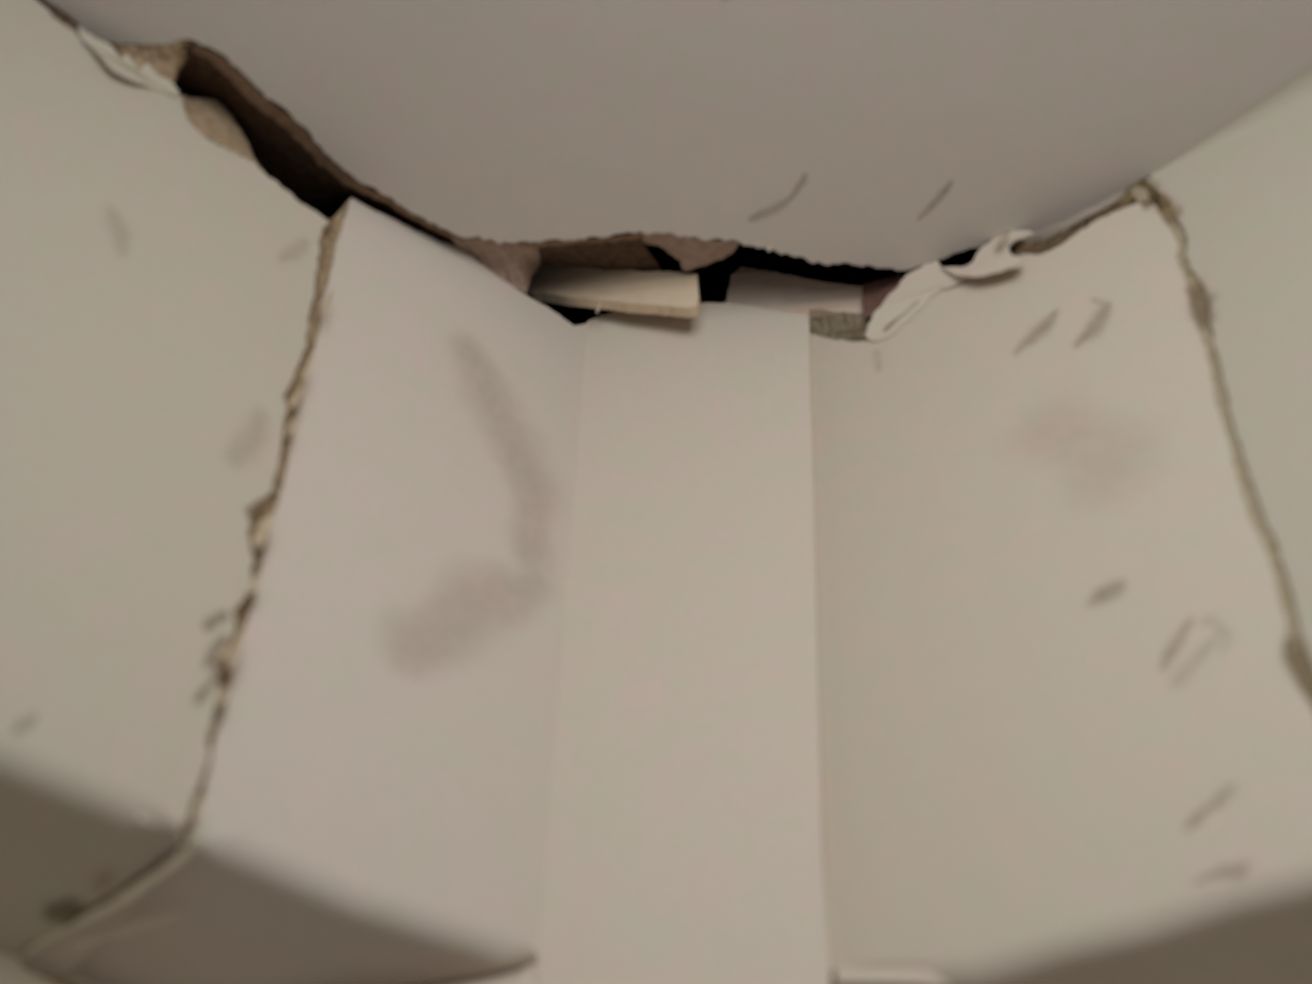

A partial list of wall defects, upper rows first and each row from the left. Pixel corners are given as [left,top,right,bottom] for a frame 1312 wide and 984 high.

crack [37,0,179,98]
spalling [115,39,394,201]
spalling [416,215,615,326]
spalling [578,230,1041,342]
crack [1009,191,1312,706]
crack [21,199,350,957]